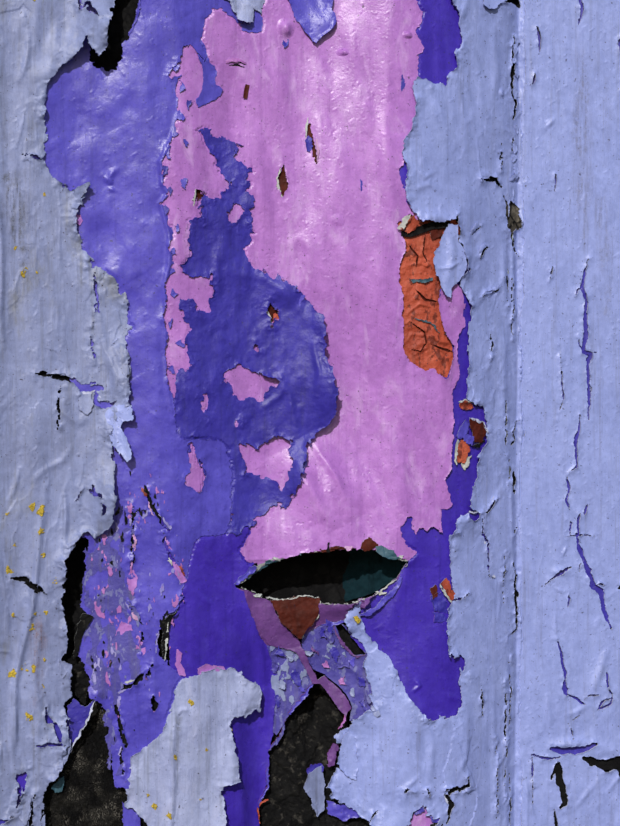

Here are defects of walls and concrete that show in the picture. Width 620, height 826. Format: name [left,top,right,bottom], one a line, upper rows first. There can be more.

spalling [483,0,520,9]
crack [484,235,516,330]
crack [35,371,108,429]
peeling [15,0,495,826]
crack [547,260,620,628]
crack [496,662,511,822]
crack [531,641,620,826]